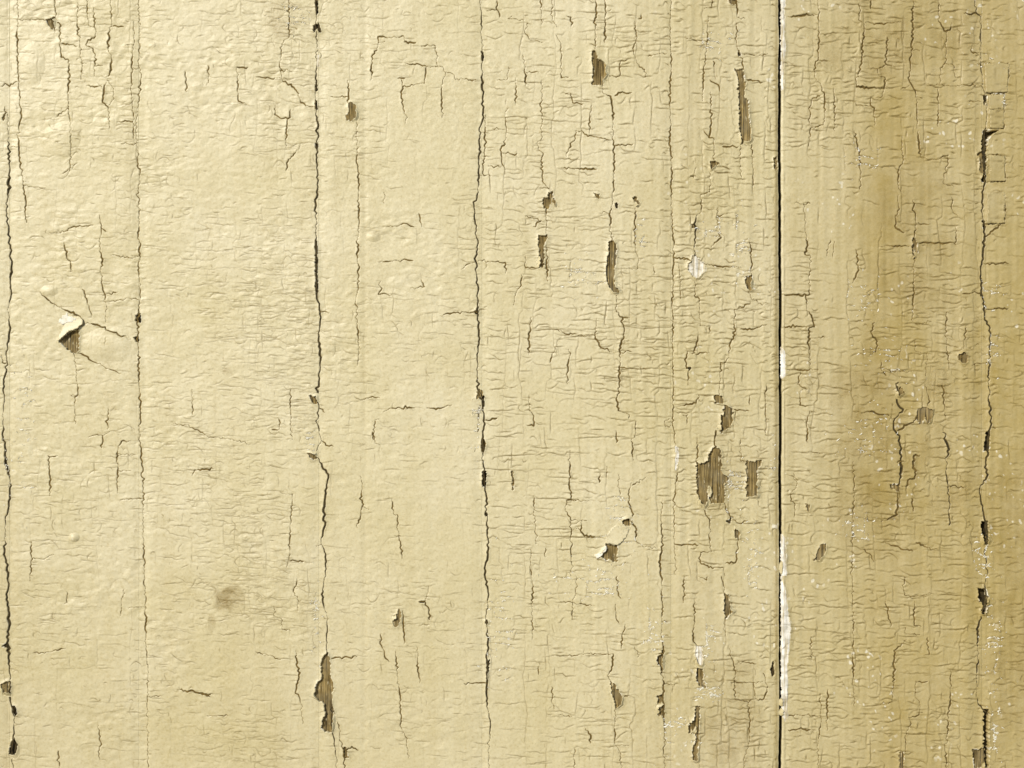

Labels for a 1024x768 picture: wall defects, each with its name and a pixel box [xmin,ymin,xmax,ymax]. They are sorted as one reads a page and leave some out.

peeling [592,51,610,85]
peeling [735,69,755,146]
peeling [57,312,83,353]
crack [1,0,228,768]
crack [175,395,247,444]
crack [236,0,859,768]
peeling [560,241,623,298]
crack [724,0,1010,768]
peeling [553,495,642,612]
peeling [696,435,776,597]
peeling [309,579,337,733]
peeling [655,625,724,765]